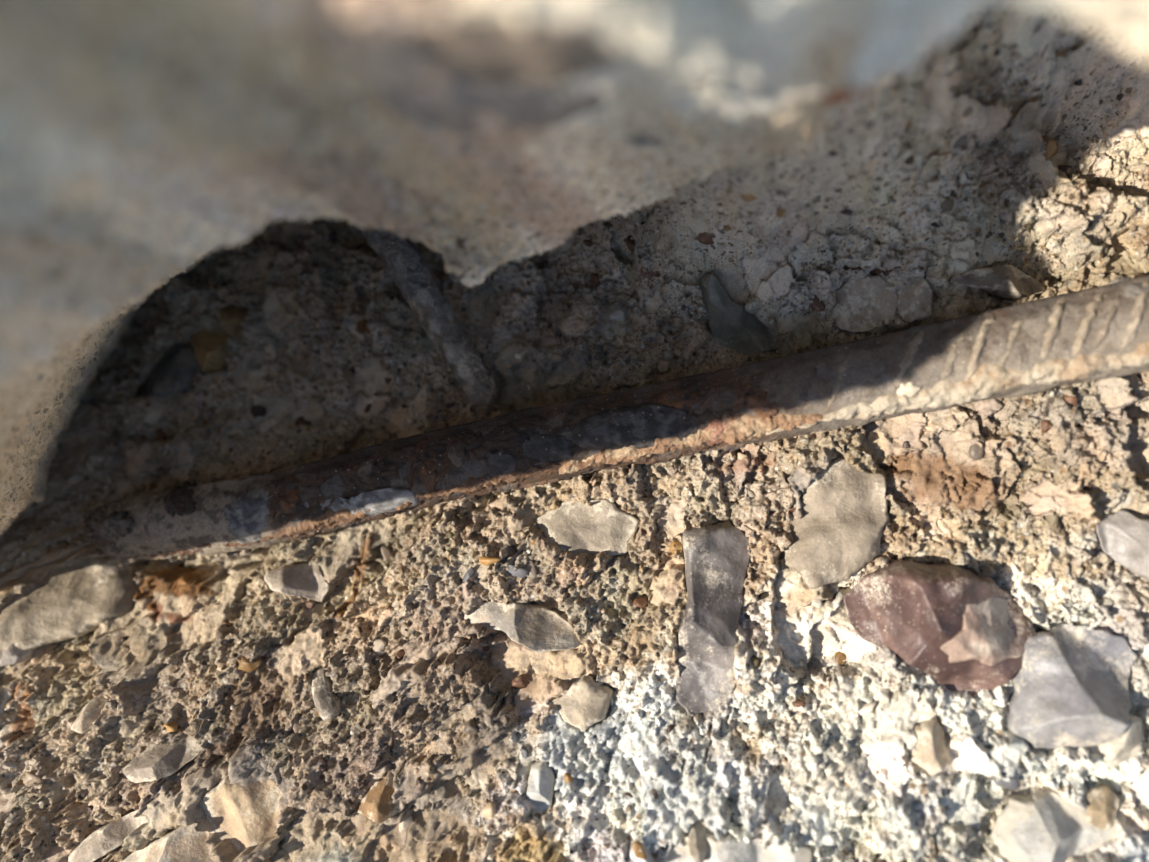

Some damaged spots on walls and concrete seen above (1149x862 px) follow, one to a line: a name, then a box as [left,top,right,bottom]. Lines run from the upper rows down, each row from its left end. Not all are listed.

spalling [0,0,1149,535]
rust [743,386,779,418]
rust [483,403,729,488]
rust [162,481,206,519]
rust [889,454,995,509]
rust [133,566,218,623]